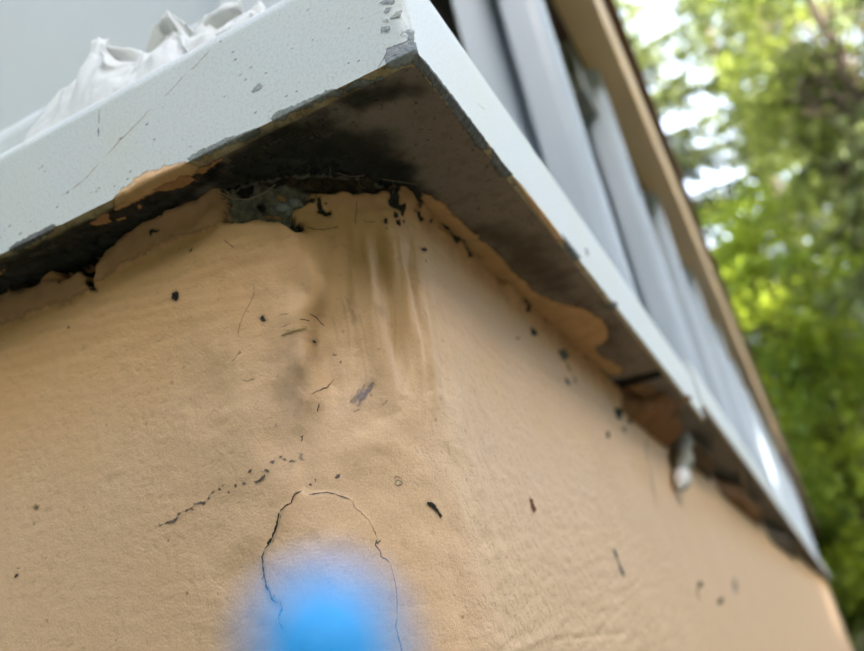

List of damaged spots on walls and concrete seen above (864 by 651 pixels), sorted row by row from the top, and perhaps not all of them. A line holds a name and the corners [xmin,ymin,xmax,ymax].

leakage [340,85,417,111]
spalling [9,224,56,252]
spalling [57,251,106,291]
leakage [0,111,431,294]
spalling [221,173,473,257]
spalling [562,234,581,261]
crack [159,435,304,526]
crack [261,491,402,650]